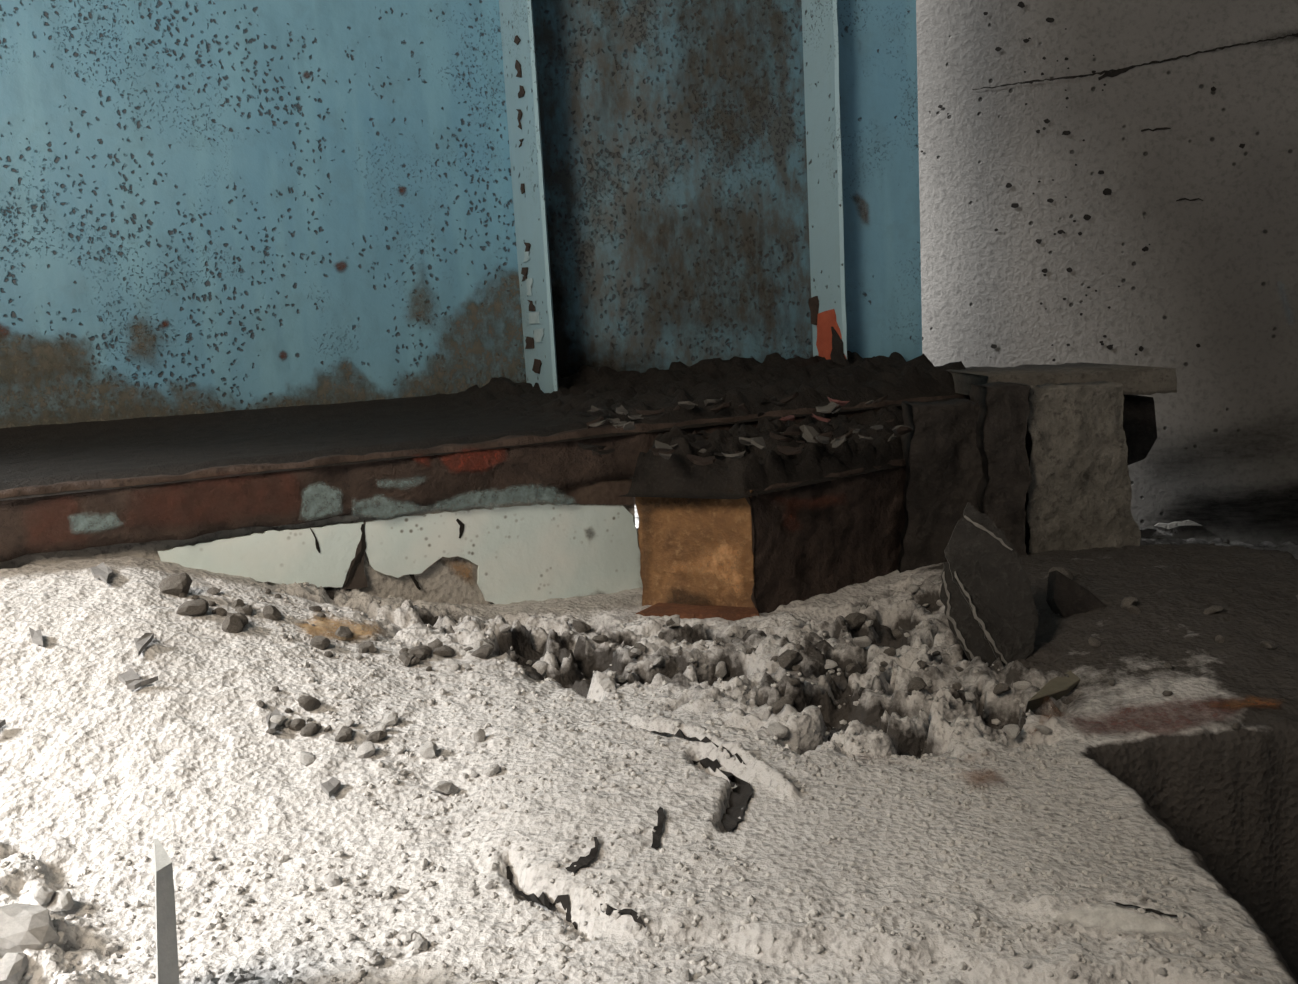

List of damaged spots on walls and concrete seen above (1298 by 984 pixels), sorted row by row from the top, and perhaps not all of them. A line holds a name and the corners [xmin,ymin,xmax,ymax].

crack [972,33,1298,90]
corrosion [0,321,233,428]
corrosion [257,272,527,409]
corrosion [552,286,646,378]
corrosion [554,478,710,530]
crack [310,528,320,553]
crack [343,520,368,590]
corrosion [673,544,742,593]